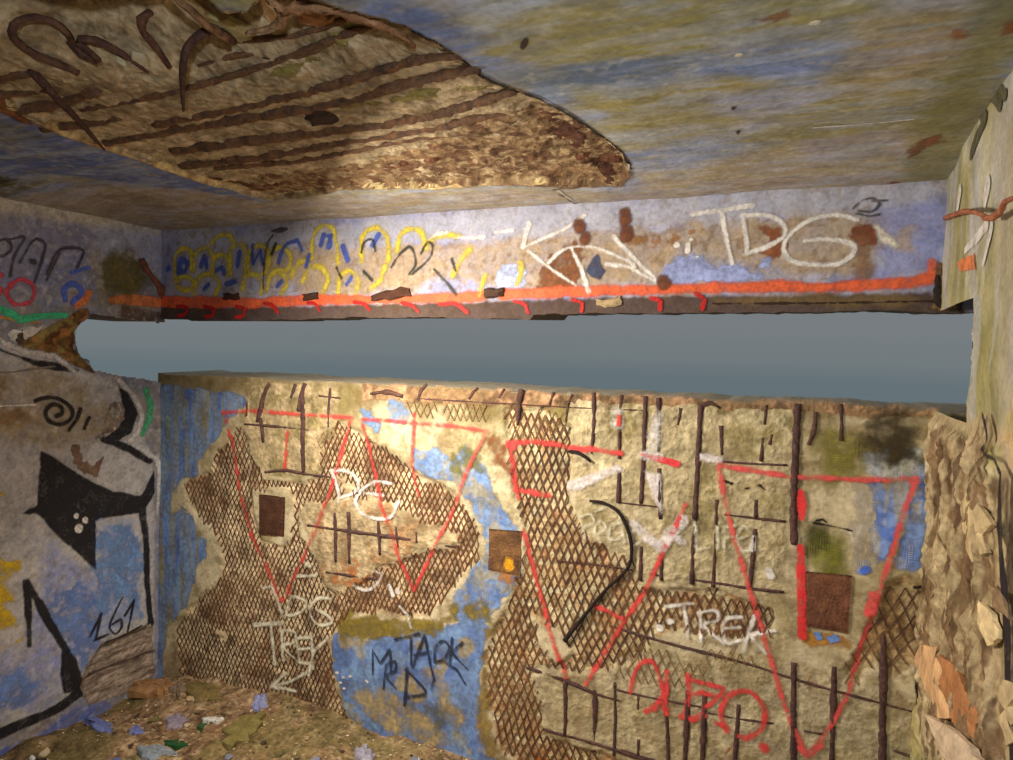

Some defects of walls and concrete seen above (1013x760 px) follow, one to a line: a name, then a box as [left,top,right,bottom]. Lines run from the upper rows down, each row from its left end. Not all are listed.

spalling [0,0,631,201]
spalling [7,309,94,373]
spalling [47,382,1013,760]
peeling [0,667,39,709]